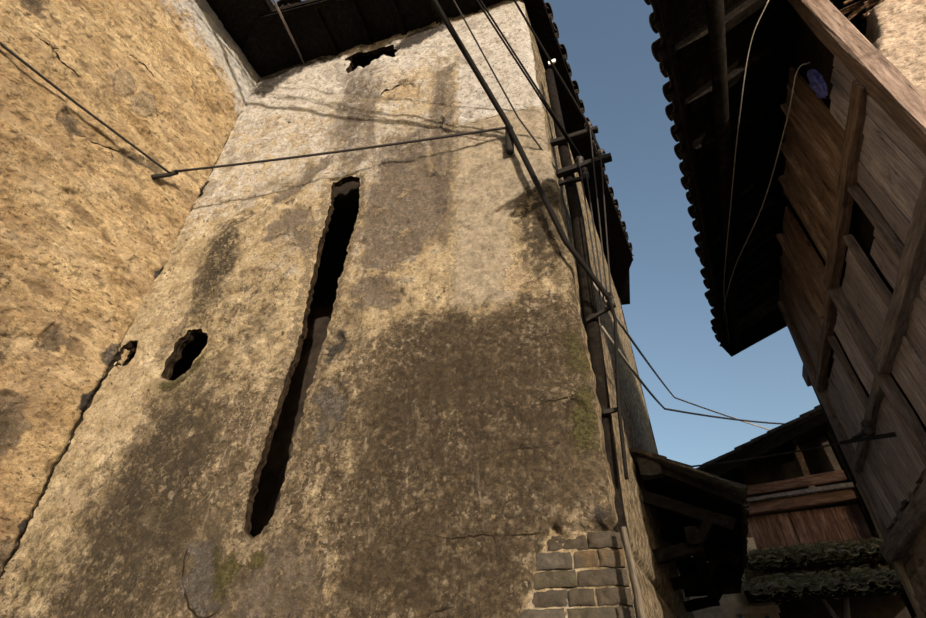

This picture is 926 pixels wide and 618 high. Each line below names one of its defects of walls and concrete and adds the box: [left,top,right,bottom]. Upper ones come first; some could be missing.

crack [32,32,81,78]
damp [337,63,457,245]
spalling [100,343,125,366]
damp [48,382,219,618]
crack [223,172,367,569]
damp [345,304,569,618]